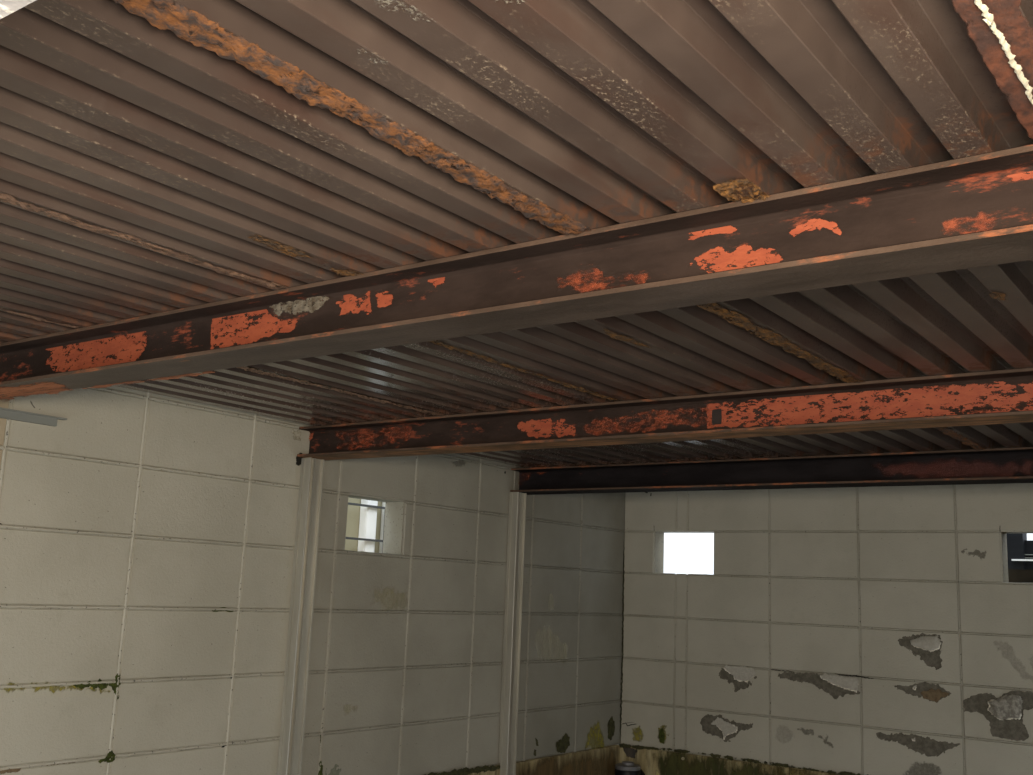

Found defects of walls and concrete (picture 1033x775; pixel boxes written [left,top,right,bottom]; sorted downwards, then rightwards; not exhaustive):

water stain [974,0,1033,104]
rust [713,179,770,203]
rust [0,371,215,400]
peeling [719,665,757,692]
peeling [778,672,860,699]
peeling [894,682,951,703]
peeling [700,714,753,742]
peeling [963,691,1033,741]
peeling [876,732,960,757]
water stain [656,752,784,775]
water stain [908,762,940,775]